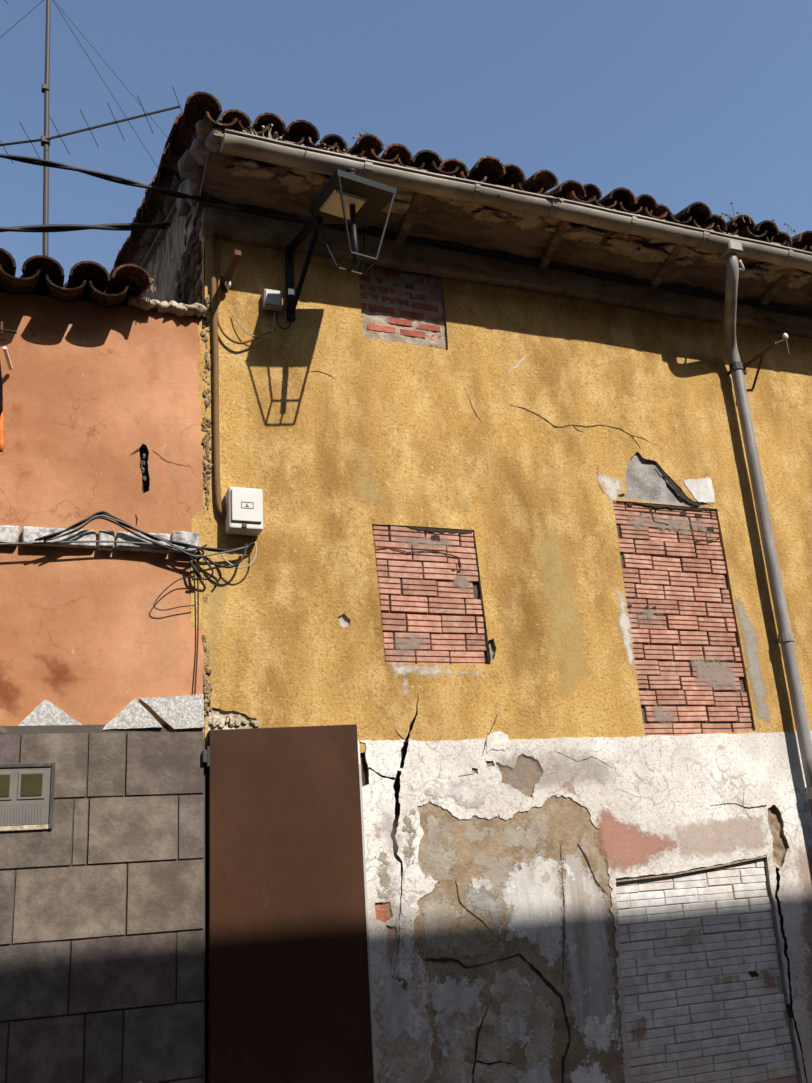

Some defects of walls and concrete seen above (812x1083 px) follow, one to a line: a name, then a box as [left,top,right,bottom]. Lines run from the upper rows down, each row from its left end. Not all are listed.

crack [512,405,656,449]
flaking render [617,452,714,531]
crack [367,700,418,977]
flaking render [375,731,625,1083]
crack [425,844,608,1083]
crack [775,867,807,1083]